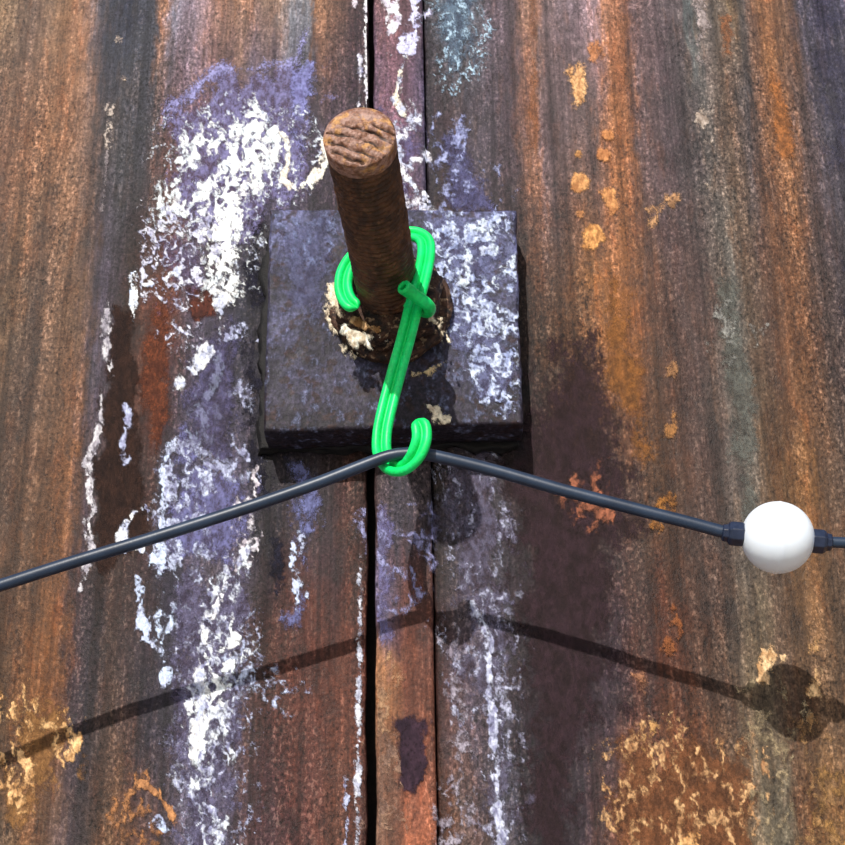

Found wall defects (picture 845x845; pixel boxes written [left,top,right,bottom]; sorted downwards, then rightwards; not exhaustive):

corrosion [136,301,175,450]
corrosion [186,283,217,323]
corrosion [575,500,615,532]
peeling [0,678,83,827]